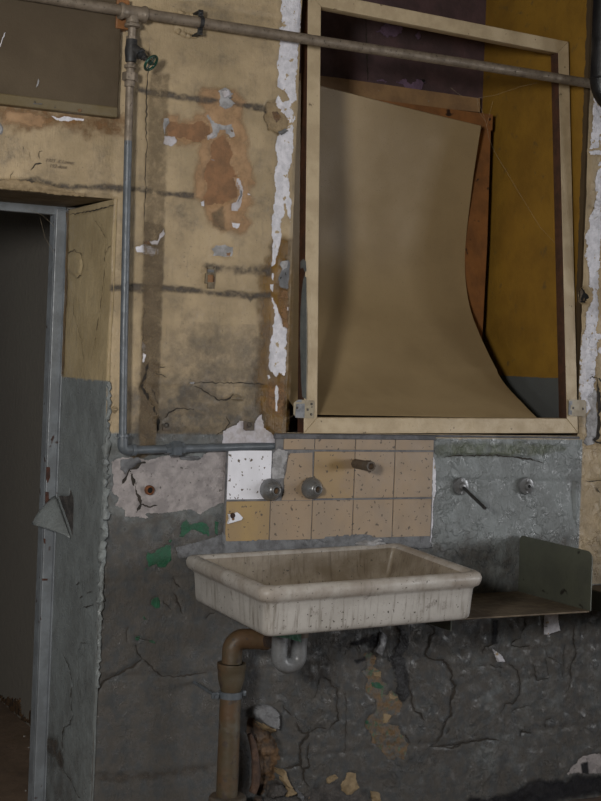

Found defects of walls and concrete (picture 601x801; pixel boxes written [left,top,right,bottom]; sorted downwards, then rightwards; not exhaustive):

peeling [279,0,301,33]
spalling [163,115,250,211]
peeling [264,41,299,411]
peeling [578,99,601,446]
crack [140,362,167,415]
crack [188,381,263,401]
crack [590,376,601,444]
flaking render [112,414,275,570]
crack [283,677,347,786]
crack [405,623,499,749]
crack [481,619,577,712]
flaking render [567,753,601,775]